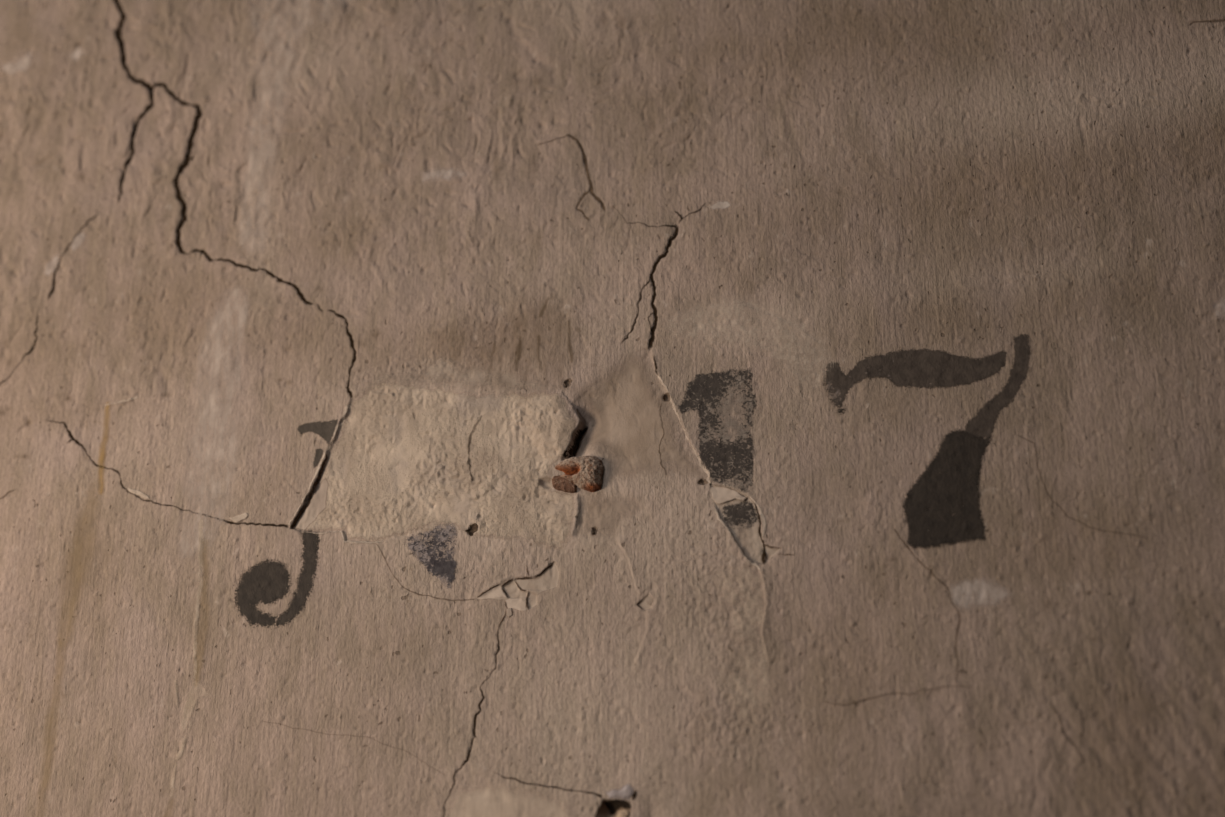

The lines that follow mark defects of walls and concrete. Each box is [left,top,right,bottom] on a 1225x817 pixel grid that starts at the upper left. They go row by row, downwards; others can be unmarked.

crack [0,0,356,397]
crack [541,134,605,219]
crack [622,205,703,374]
crack [56,422,287,527]
flaking render [288,361,790,570]
flaking render [477,562,559,625]
crack [443,618,503,817]
crack [502,776,601,797]
flaking render [595,784,636,817]